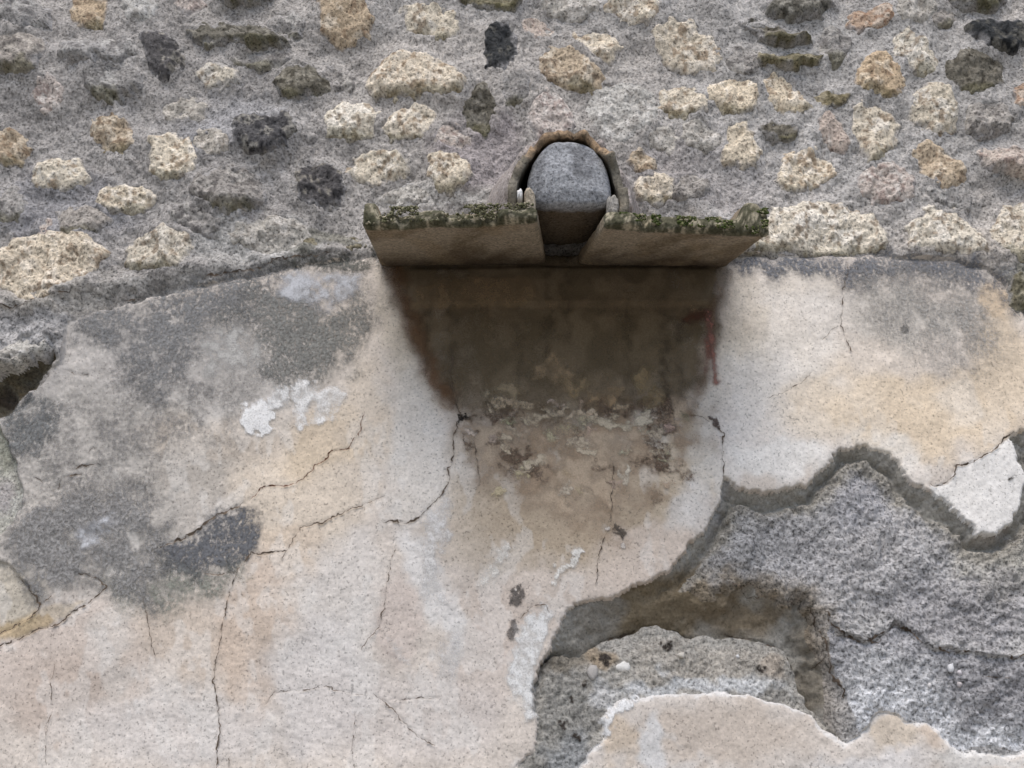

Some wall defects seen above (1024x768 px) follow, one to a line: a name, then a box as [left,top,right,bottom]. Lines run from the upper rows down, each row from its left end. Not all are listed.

crack [0,573,107,646]
crack [35,446,100,489]
crack [161,415,364,547]
crack [204,348,480,768]
leakage [3,249,720,614]
crack [595,466,615,585]
spalling [517,446,1024,768]
spalling [1008,432,1024,480]